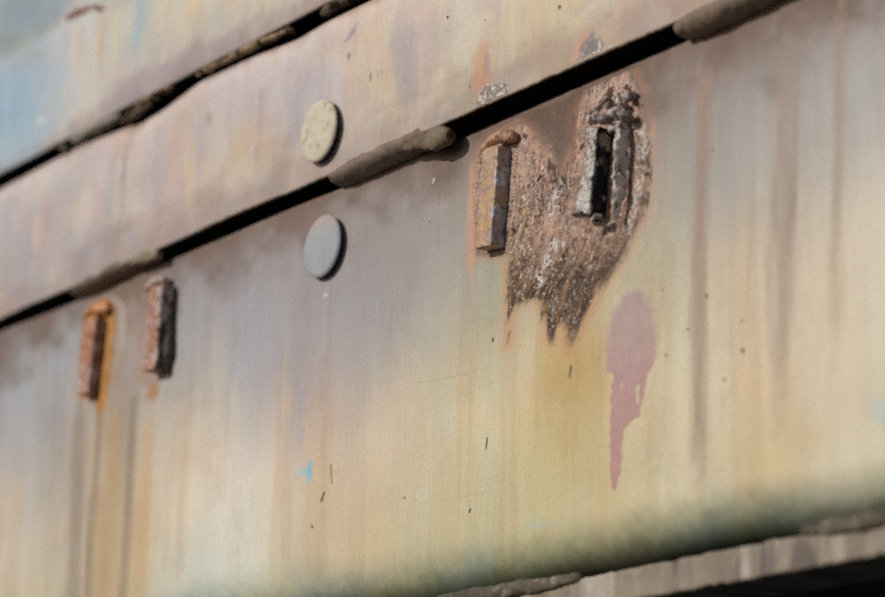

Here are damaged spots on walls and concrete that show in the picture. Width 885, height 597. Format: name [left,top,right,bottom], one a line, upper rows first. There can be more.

corrosion [60,282,166,597]
corrosion [458,65,666,496]
damp [763,15,807,460]
damp [824,0,849,395]